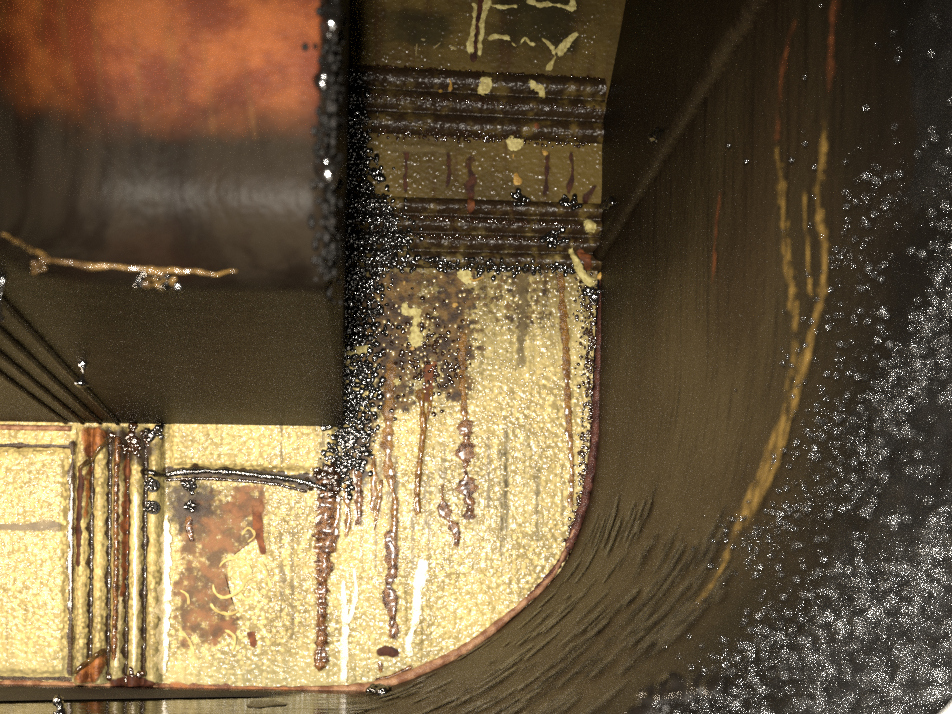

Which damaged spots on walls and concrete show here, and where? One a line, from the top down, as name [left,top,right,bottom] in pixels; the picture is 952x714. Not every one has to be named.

rust [75,427,111,567]
rust [119,455,131,597]
rust [173,485,272,653]